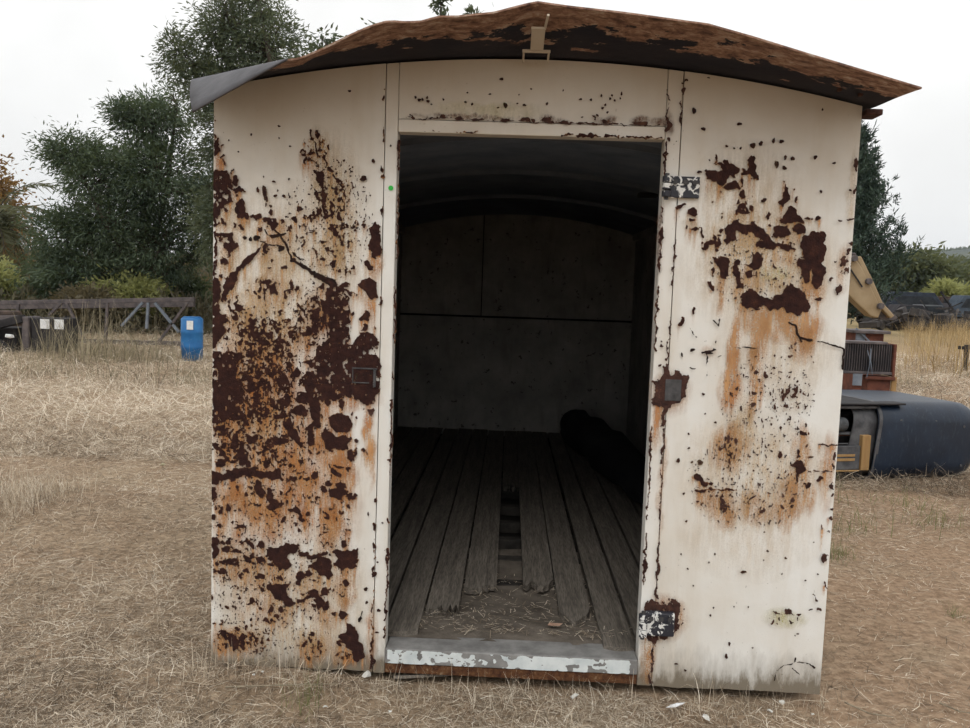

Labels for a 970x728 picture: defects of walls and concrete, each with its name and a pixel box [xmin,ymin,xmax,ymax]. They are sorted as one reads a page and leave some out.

rust [408,79,696,176]
rust [211,125,696,684]
rust [769,573,828,636]
peeling [387,650,631,674]